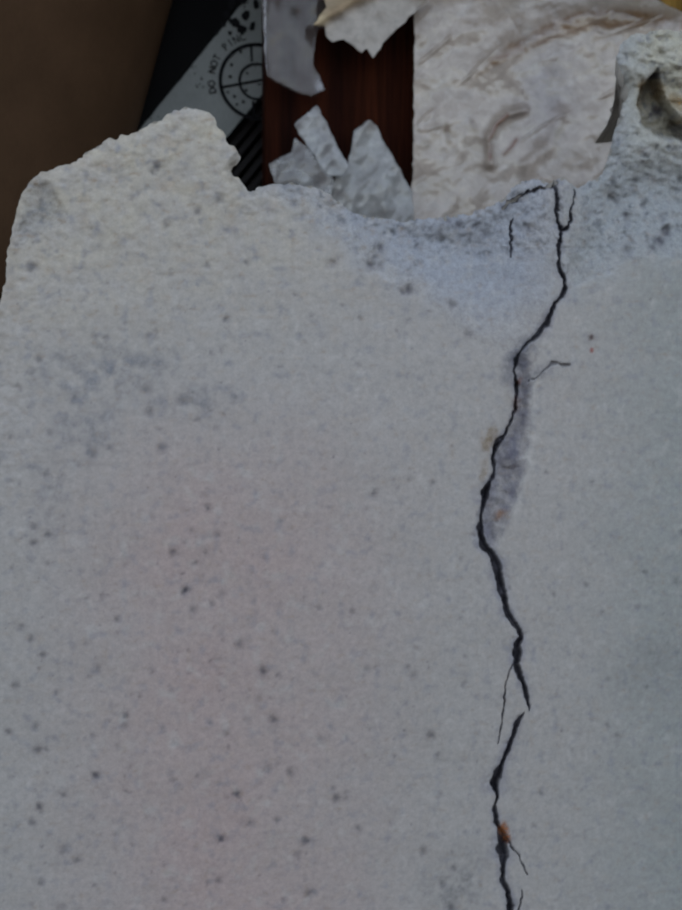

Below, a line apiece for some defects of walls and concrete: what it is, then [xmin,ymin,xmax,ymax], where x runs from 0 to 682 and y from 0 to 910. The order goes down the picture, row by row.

crack [476,180,576,910]